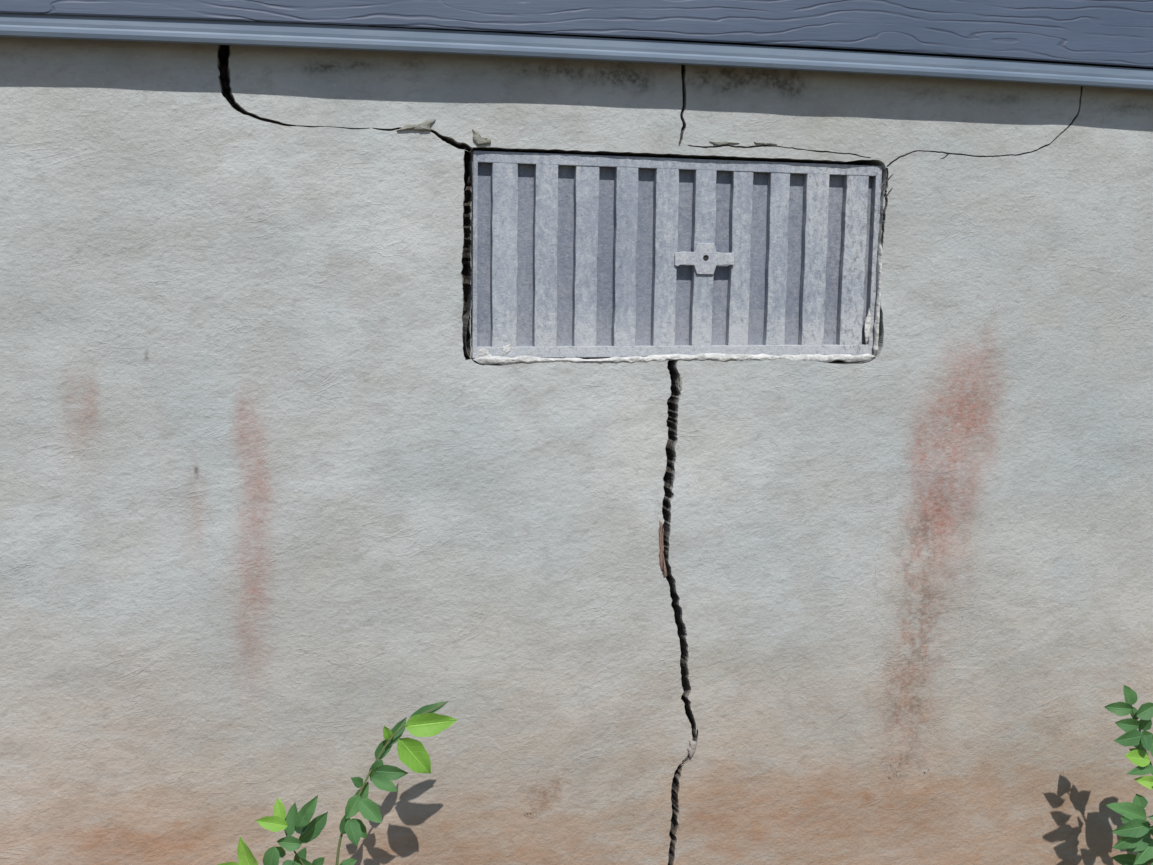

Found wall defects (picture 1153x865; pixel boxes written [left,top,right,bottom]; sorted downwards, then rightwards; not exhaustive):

crack [217,45,491,360]
crack [678,65,1083,248]
crack [659,360,698,865]
rust [860,300,1022,792]